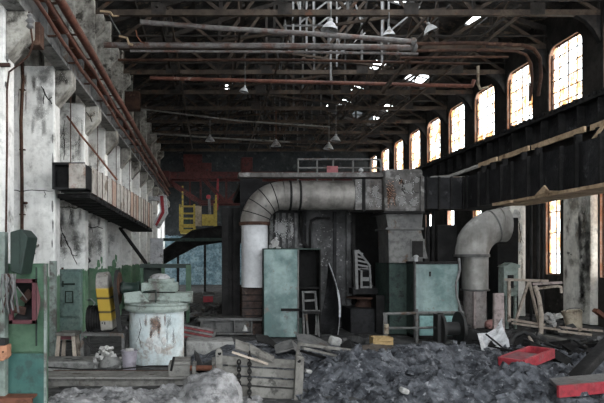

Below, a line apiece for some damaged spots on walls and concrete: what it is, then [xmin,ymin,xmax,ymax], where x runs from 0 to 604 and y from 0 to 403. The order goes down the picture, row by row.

crack [60,206,79,264]
water stain [567,198,585,252]